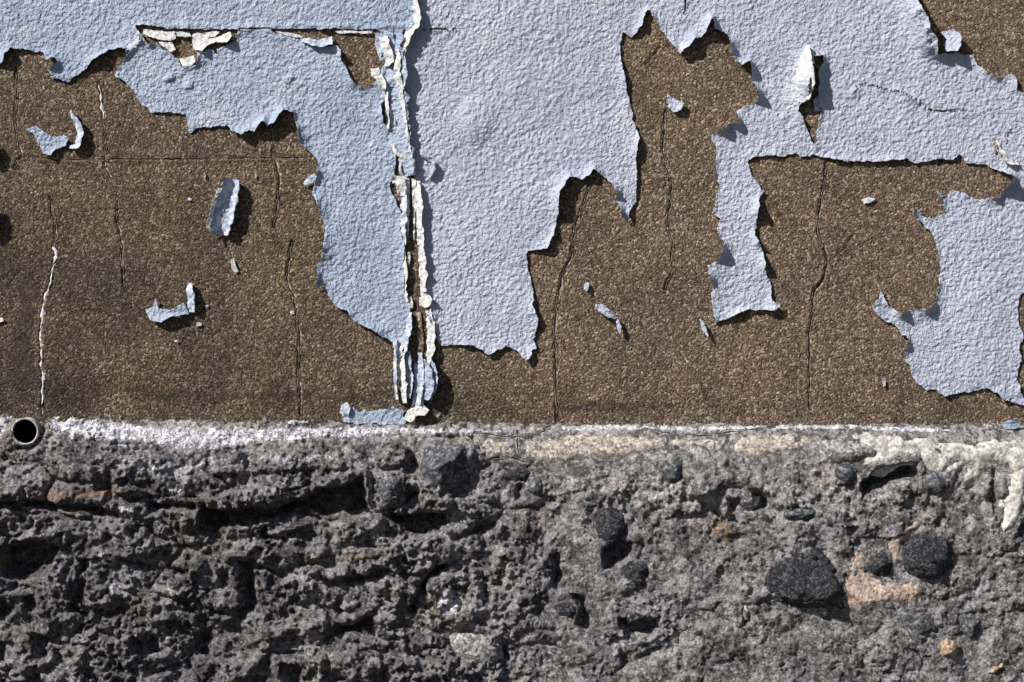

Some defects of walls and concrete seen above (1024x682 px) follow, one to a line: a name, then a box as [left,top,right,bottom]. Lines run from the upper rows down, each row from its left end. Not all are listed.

crack [0,71,312,415]
peeling [340,402,406,425]
peeling [0,0,1024,405]
crack [475,178,593,472]
crack [807,163,853,410]
peeling [1001,418,1022,429]